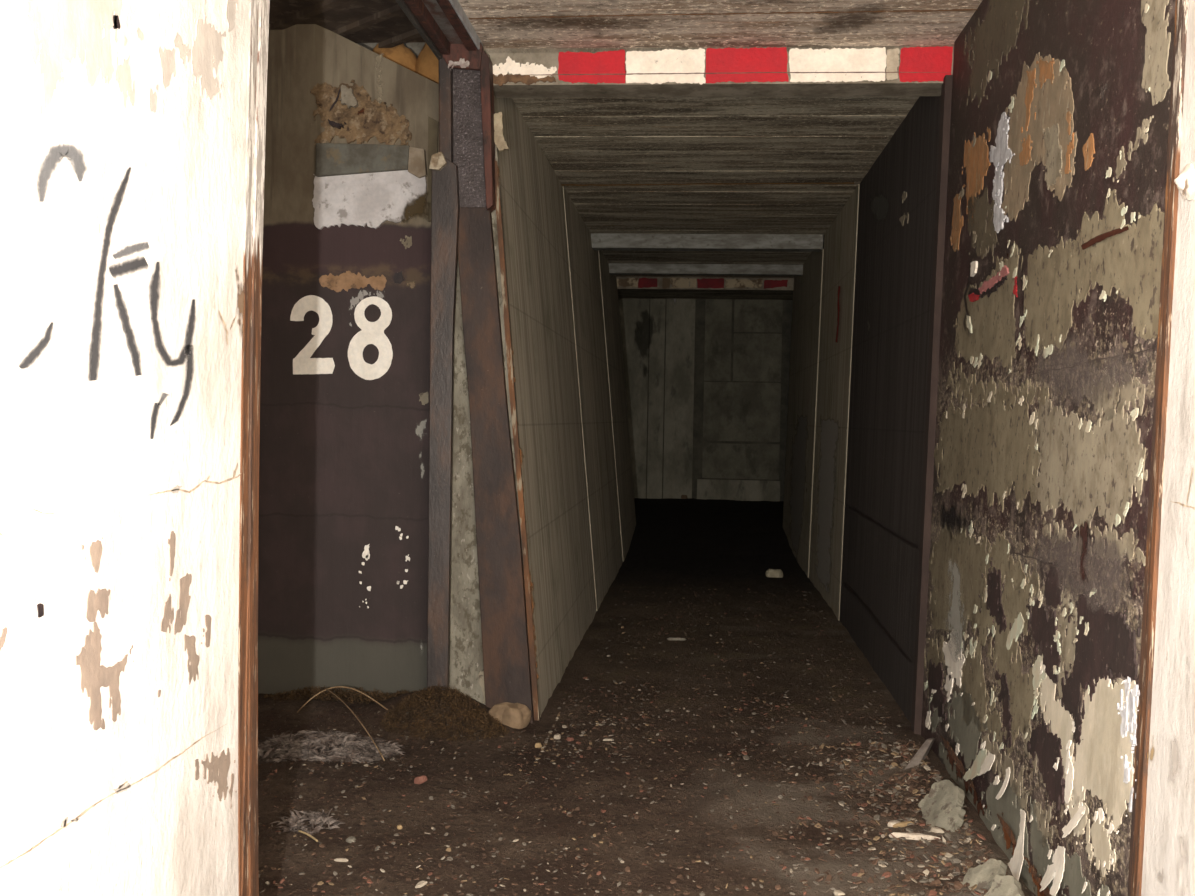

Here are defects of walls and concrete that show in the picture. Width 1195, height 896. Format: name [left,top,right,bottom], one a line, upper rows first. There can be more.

peeling [20,0,238,118]
peeling [428,116,439,222]
peeling [319,271,387,326]
peeling [934,0,1172,567]
crack [150,463,241,495]
peeling [81,538,103,573]
peeling [75,588,134,731]
crack [0,726,223,869]
peeling [161,531,212,685]
peeling [195,748,237,809]
corrosion [940,735,1051,896]
peeling [924,521,1140,896]